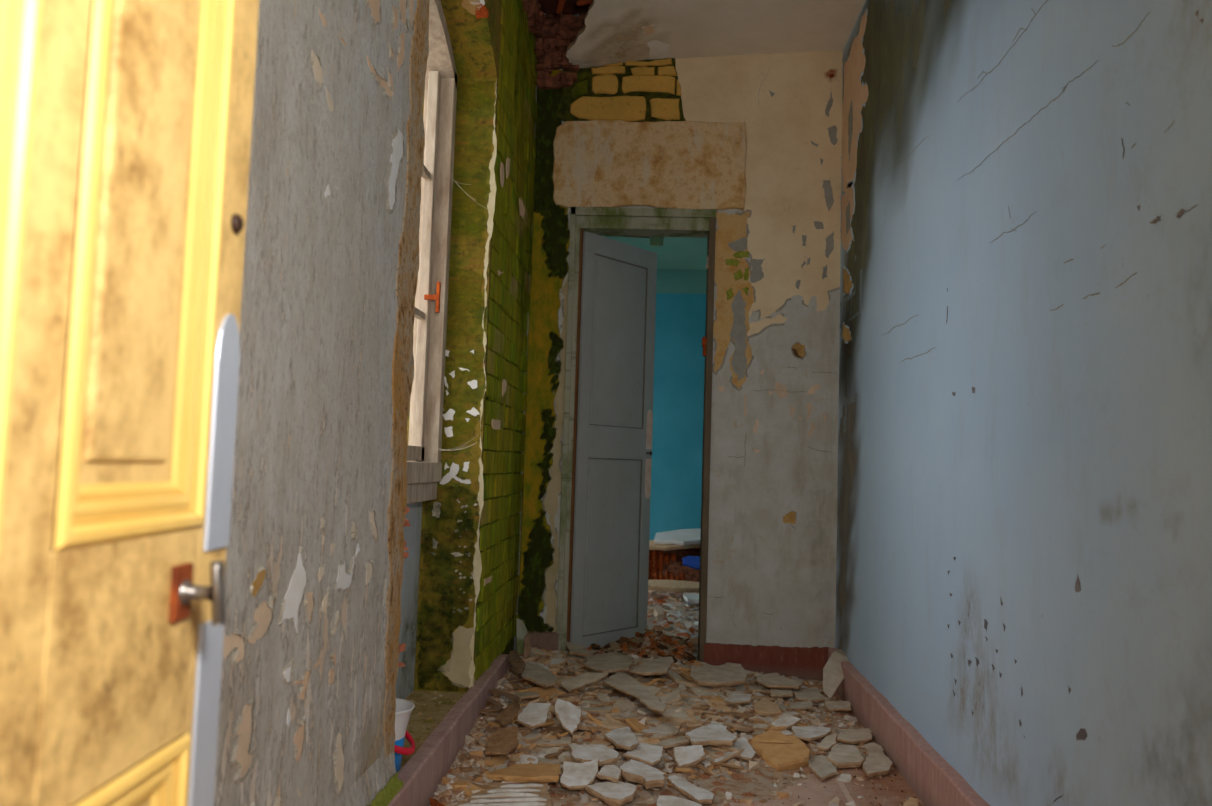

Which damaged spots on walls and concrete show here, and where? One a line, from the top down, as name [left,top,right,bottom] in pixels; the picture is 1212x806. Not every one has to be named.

crack [957,0,1150,181]
crack [992,207,1037,242]
flaking render [223,0,430,762]
peeling [439,0,869,688]
damp [836,0,959,650]
damp [968,619,1002,678]
peeling [229,697,255,785]
peeling [333,733,344,796]